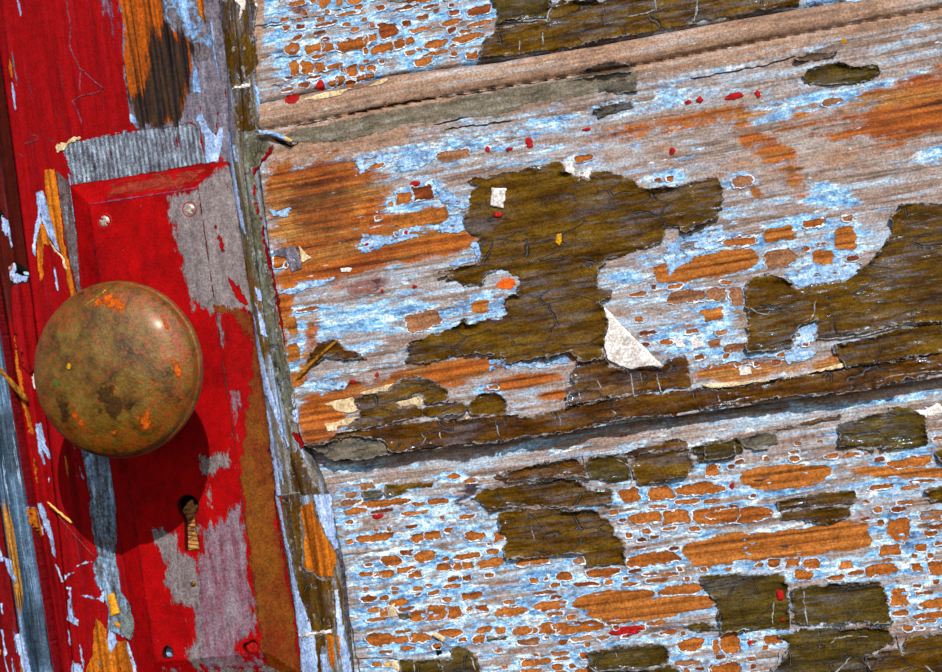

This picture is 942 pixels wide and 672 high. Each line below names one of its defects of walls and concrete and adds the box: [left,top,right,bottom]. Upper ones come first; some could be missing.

peeling [278,0,868,100]
peeling [355,146,471,175]
peeling [32,0,335,452]
peeling [11,283,38,389]
corrosion [94,292,126,313]
corrosion [56,398,85,427]
corrosion [97,382,152,435]
peeling [266,154,942,672]
peeling [198,452,230,477]
peeling [152,458,279,672]